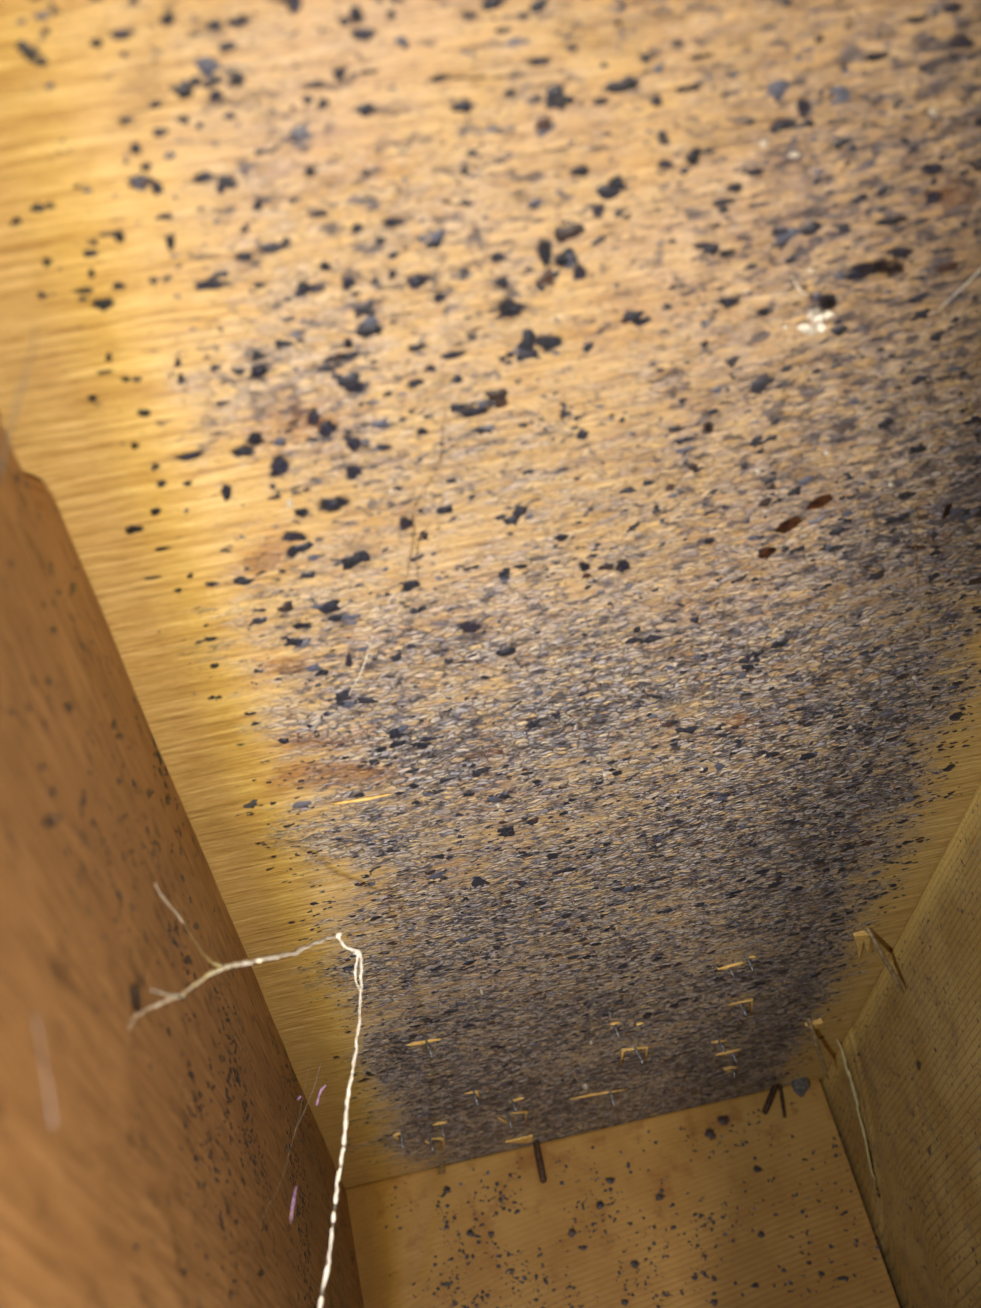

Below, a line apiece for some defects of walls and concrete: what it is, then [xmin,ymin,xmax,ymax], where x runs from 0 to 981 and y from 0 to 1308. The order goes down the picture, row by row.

mould [15,1,62,66]
mould [90,30,136,57]
mould [169,12,257,127]
mould [277,0,302,13]
mould [354,103,379,117]
mould [447,97,477,115]
leakage [461,0,666,138]
leakage [11,203,55,226]
leakage [112,142,183,284]
leakage [615,35,911,348]
leakage [192,118,640,518]
leakage [64,316,981,1308]